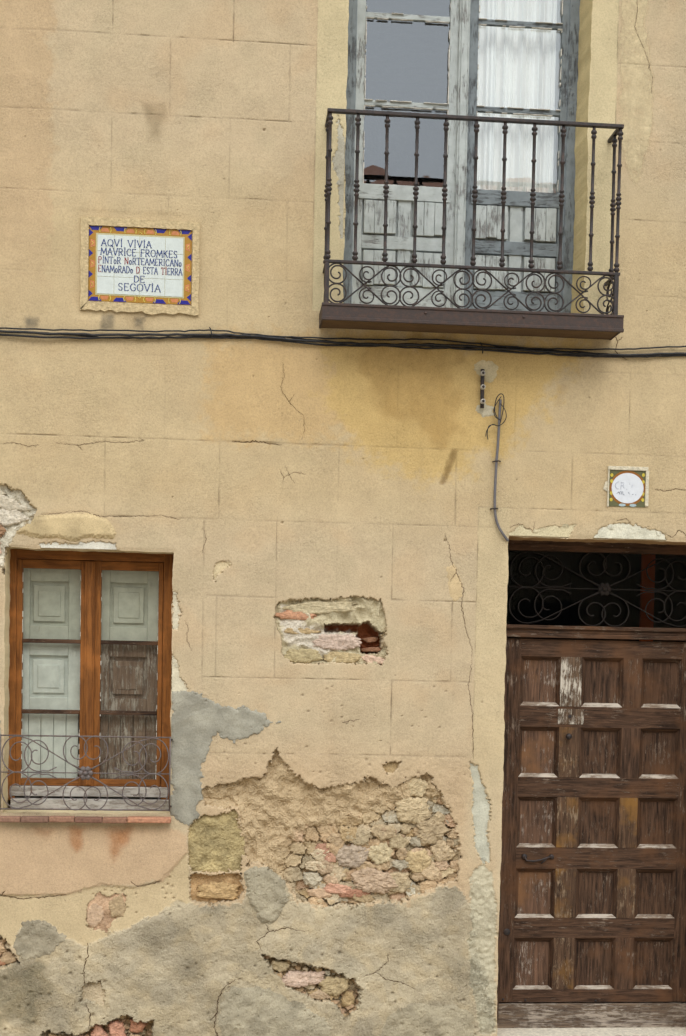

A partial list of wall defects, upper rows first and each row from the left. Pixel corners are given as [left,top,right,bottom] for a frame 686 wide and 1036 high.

flaking render [0,484,37,574]
peeling [509,524,576,537]
peeling [594,523,666,540]
flaking render [274,597,388,665]
flaking render [188,749,461,909]
peeling [470,763,491,864]
flaking render [87,892,127,933]
flaking render [0,935,18,966]
flaking render [264,955,361,1017]
flaking render [44,1015,154,1036]